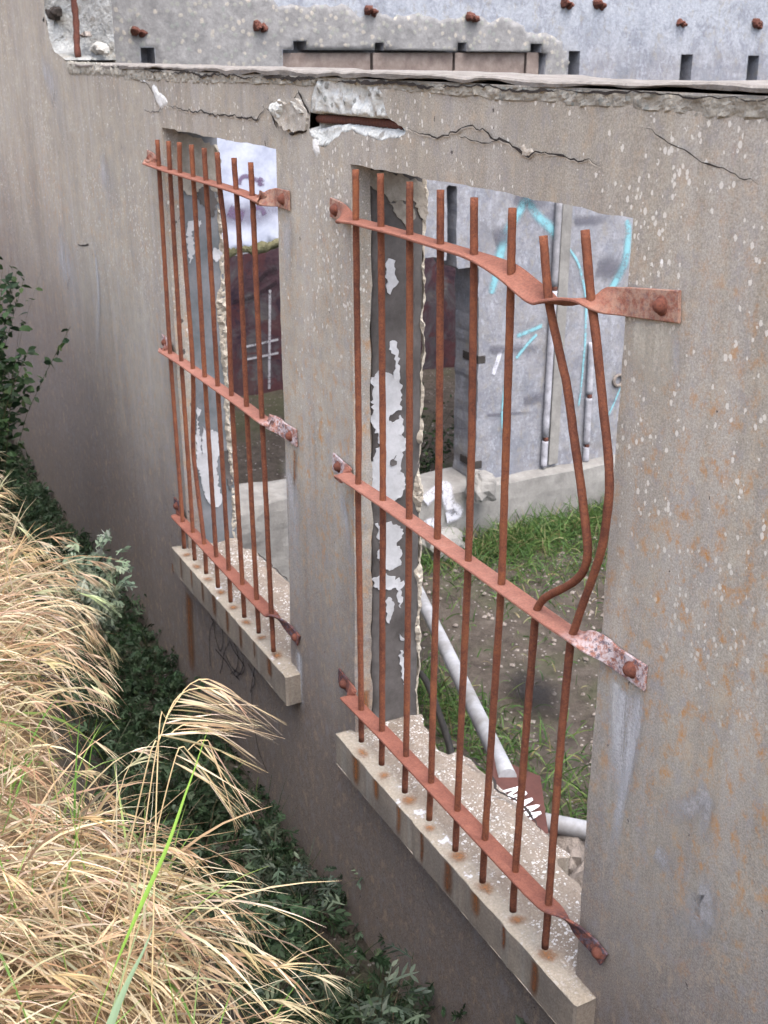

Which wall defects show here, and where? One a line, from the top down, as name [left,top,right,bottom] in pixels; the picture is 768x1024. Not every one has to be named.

flaking render [43,0,570,78]
spalling [269,80,405,156]
crack [101,66,768,128]
crack [406,125,601,168]
crack [647,128,756,183]
peeling [173,132,237,538]
peeling [367,168,429,518]
rust [172,553,266,661]
peeling [372,521,423,715]
rust [354,749,366,782]
rust [445,852,465,891]
rust [472,884,490,913]